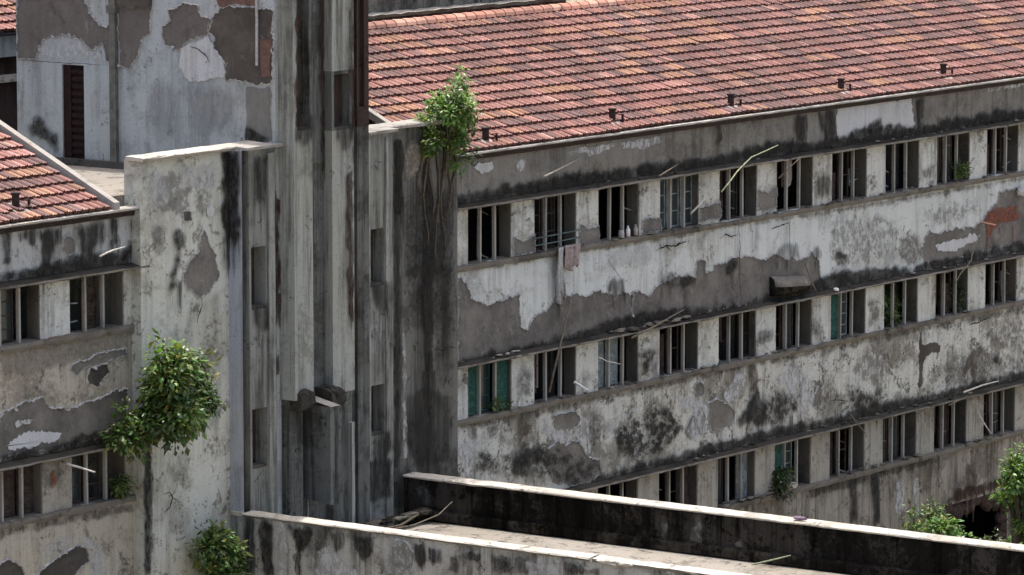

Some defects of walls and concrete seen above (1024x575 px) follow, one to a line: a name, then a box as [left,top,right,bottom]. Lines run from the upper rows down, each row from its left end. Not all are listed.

flaking render [15,0,276,140]
water stain [29,117,57,151]
water stain [457,100,1024,205]
flaking render [182,229,220,299]
water stain [222,151,241,274]
water stain [370,139,452,501]
flaking render [458,250,822,362]
water stain [463,241,1024,362]
flaking render [900,179,1024,265]
flaking render [0,347,131,462]
water stain [478,346,1024,484]
flaking render [0,543,90,575]